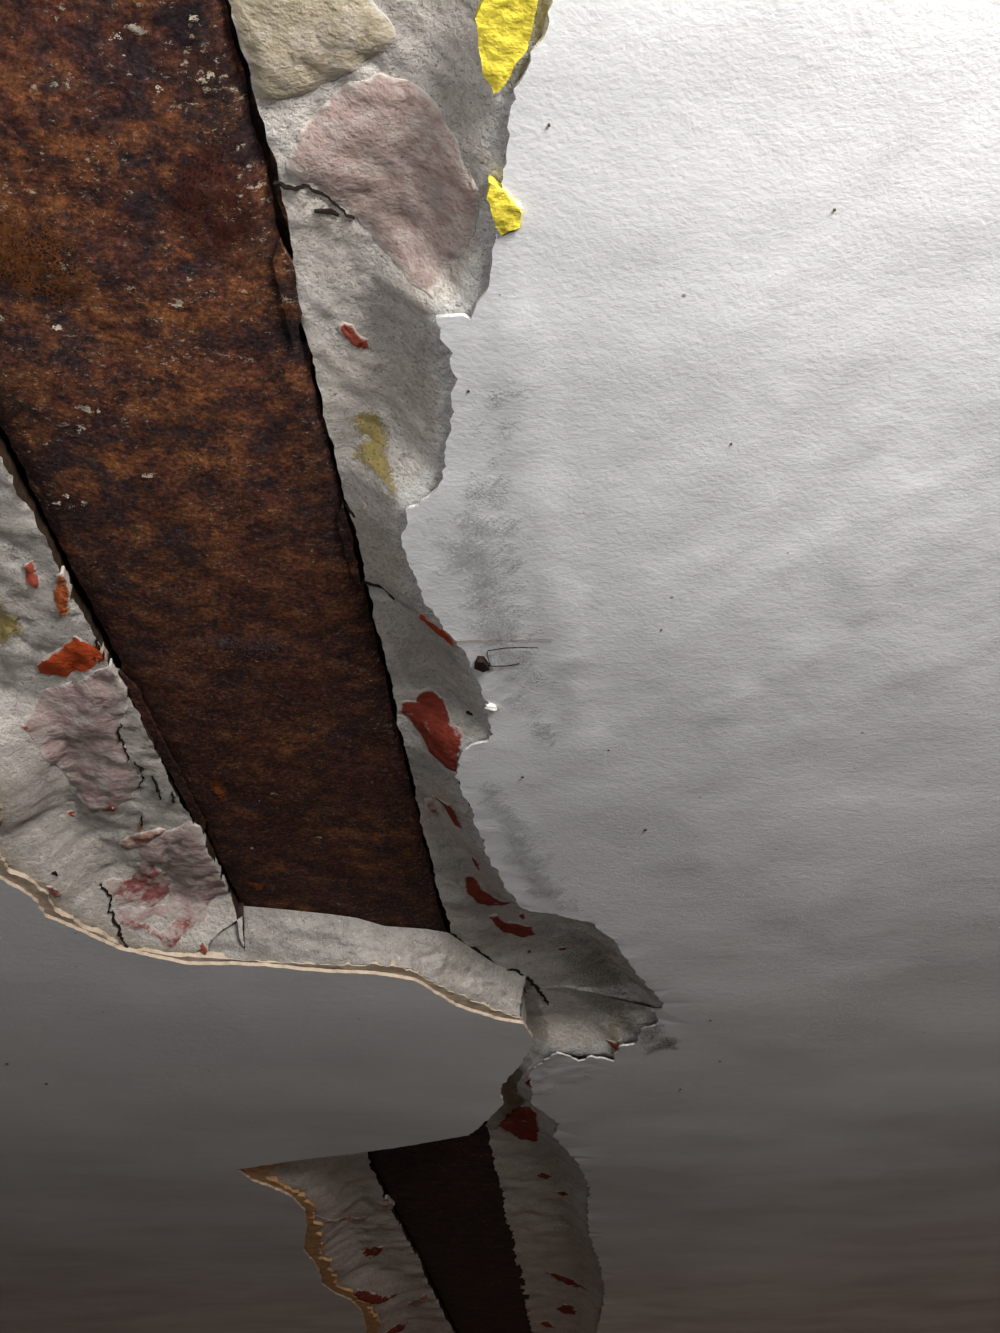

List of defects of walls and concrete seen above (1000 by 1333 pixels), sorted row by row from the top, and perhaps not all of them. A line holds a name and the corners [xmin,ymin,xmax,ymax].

flaking render [0,0,663,1333]